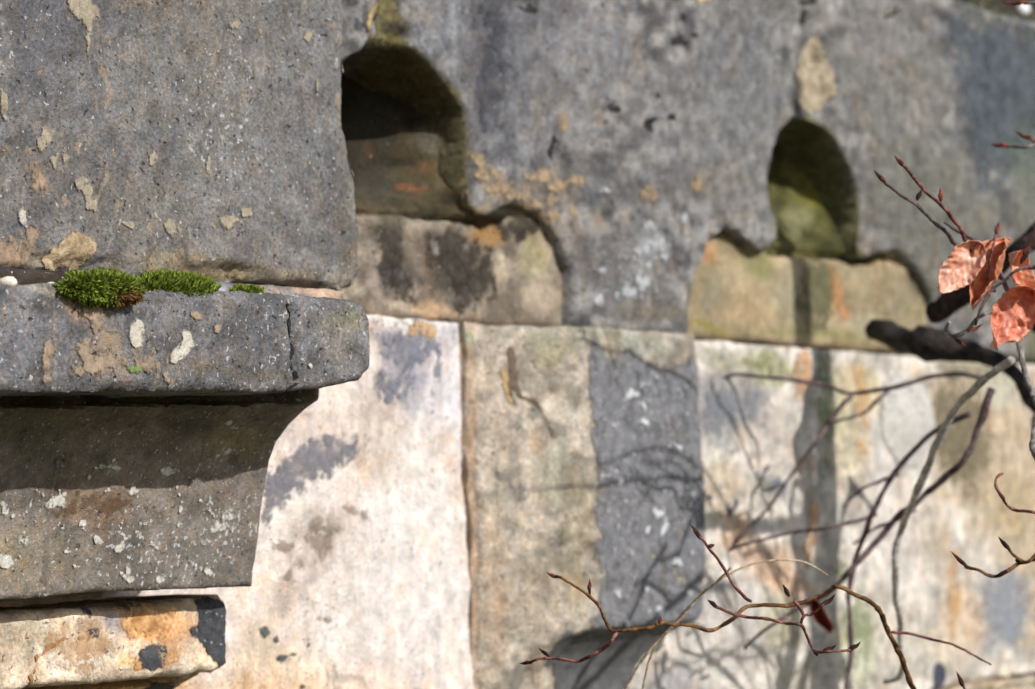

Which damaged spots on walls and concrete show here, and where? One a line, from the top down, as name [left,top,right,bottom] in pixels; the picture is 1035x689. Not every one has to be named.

peeling [68,0,102,52]
spalling [800,0,816,25]
spalling [794,36,838,114]
peeling [0,88,8,121]
peeling [30,124,70,195]
spalling [0,202,97,271]
peeling [75,176,97,211]
peeling [164,218,180,236]
peeling [221,207,252,229]
crack [285,303,301,392]